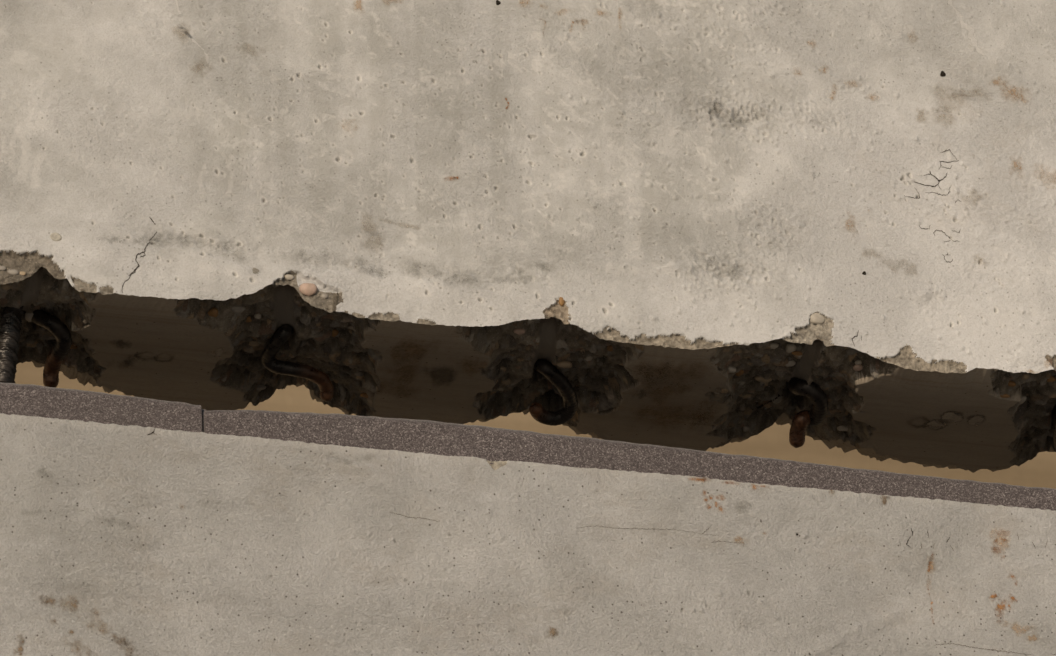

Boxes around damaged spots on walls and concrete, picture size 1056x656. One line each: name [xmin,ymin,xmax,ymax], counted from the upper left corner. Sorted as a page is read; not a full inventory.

crack [904,149,960,203]
spalling [0,250,113,381]
crack [121,218,157,293]
spalling [174,271,400,416]
spalling [454,297,967,448]
spalling [990,355,1056,467]